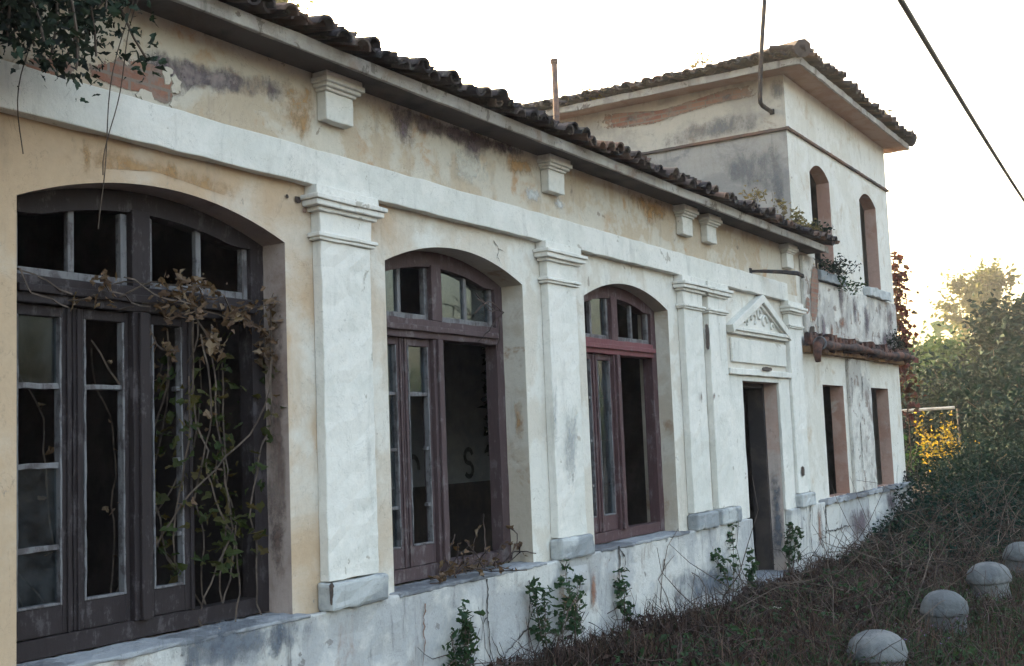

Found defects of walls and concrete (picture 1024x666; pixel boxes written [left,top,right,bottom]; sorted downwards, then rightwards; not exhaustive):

flaking render [89,57,182,109]
damp [156,56,240,90]
damp [394,112,512,154]
flaking render [595,82,756,130]
damp [689,117,752,137]
damp [839,288,869,332]